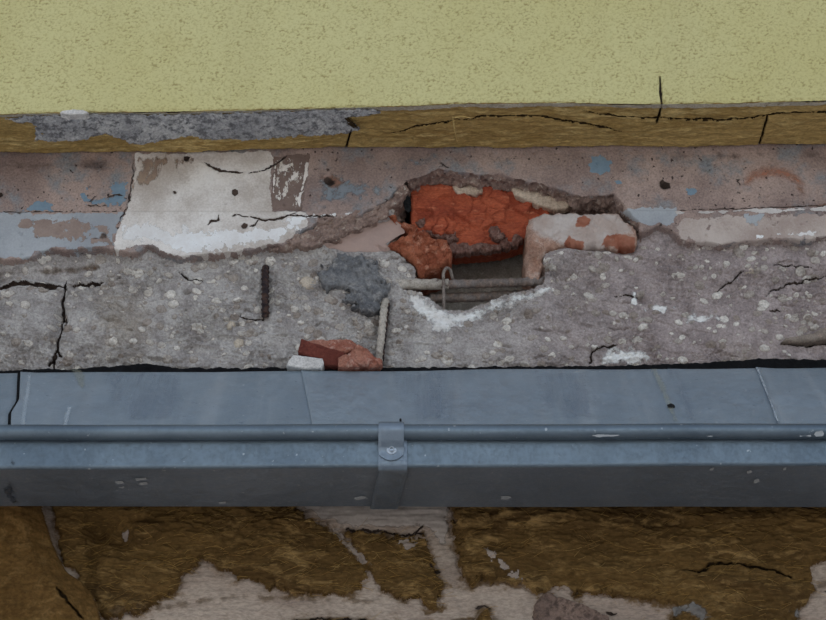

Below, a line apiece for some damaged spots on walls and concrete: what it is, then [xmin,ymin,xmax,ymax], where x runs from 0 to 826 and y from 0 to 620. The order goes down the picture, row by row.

crack [393,79,826,133]
spalling [0,107,826,371]
crack [0,280,104,369]
crack [766,264,826,312]